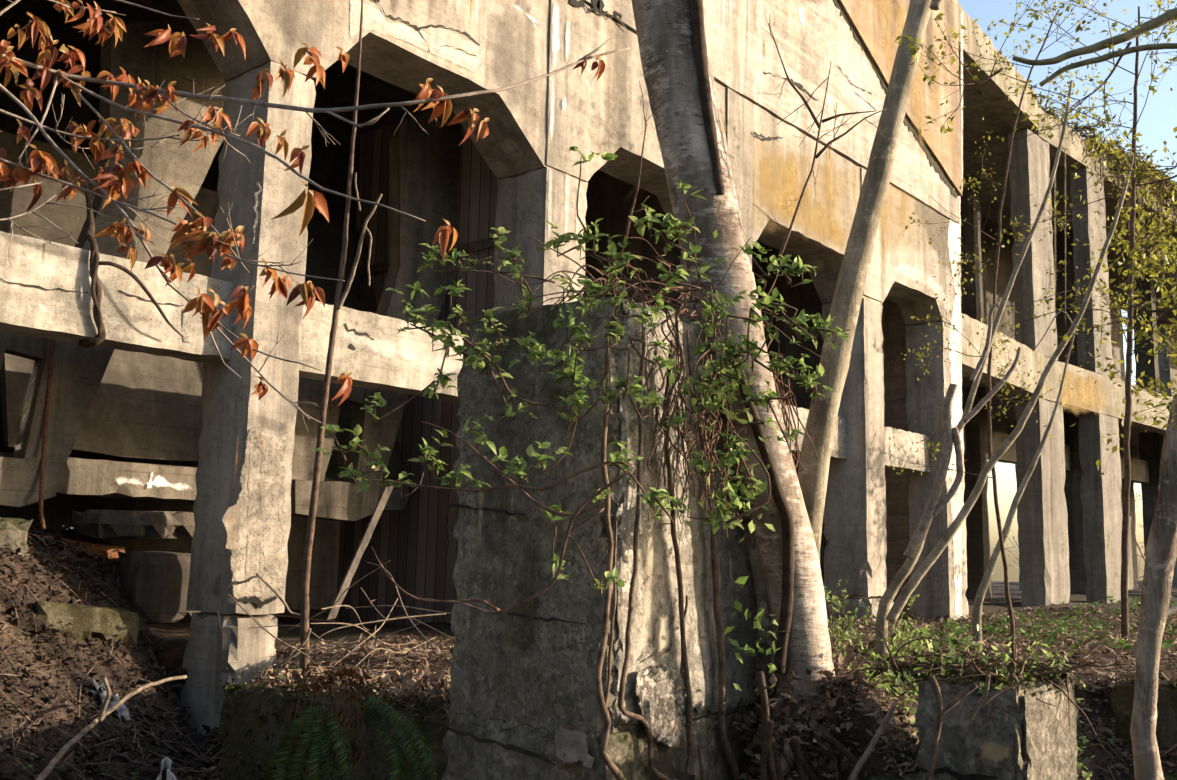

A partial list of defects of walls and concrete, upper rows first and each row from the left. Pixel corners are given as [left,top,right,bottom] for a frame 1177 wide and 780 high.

spalling [348,0,480,73]
crack [373,0,480,56]
damp [761,159,808,218]
damp [1061,373,1104,411]
spalling [222,428,288,599]
spalling [636,616,687,749]
crack [432,722,555,766]
crack [916,766,997,780]